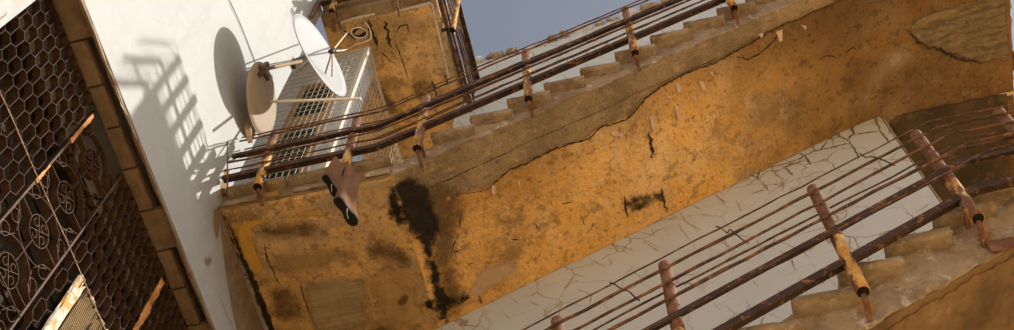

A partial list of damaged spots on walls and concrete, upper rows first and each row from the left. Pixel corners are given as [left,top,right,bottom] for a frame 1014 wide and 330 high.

crack [368,20,409,77]
water stain [369,245,408,262]
water stain [388,177,517,324]
crack [450,202,661,330]
crack [428,0,840,266]
water stain [624,188,668,217]
crack [679,118,889,229]